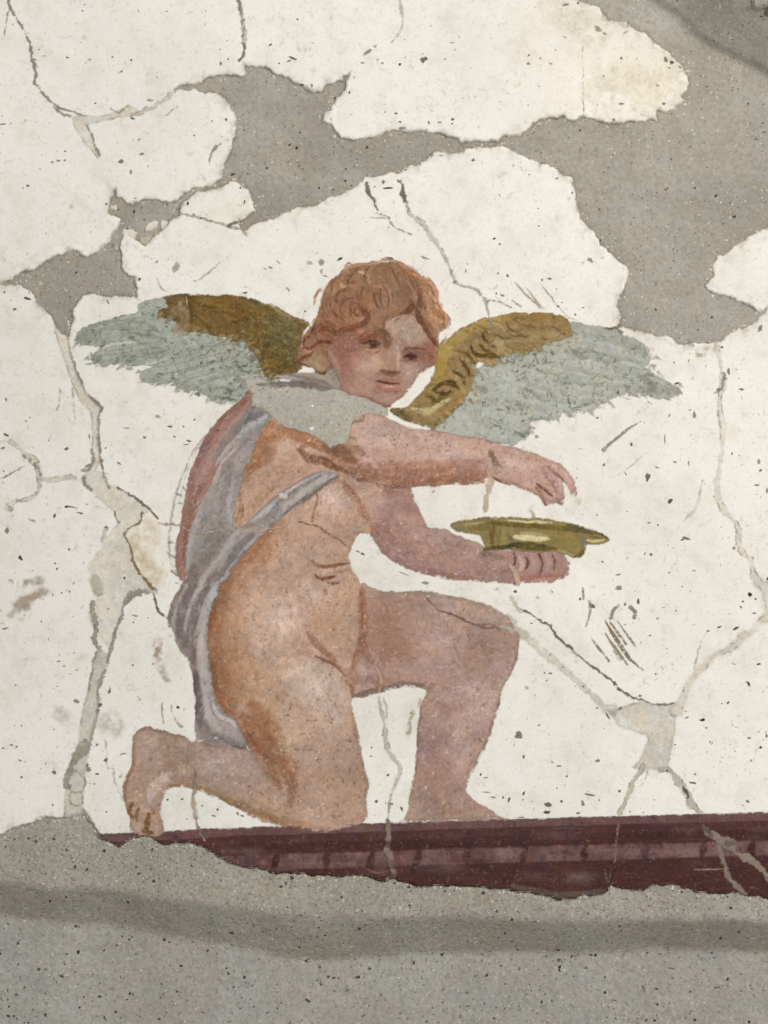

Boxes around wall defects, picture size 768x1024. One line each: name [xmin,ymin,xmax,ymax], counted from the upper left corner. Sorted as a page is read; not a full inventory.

crack [4,0,176,157]
crack [236,0,246,62]
flaking render [2,0,768,358]
crack [365,180,512,334]
flaking render [240,376,388,449]
crack [3,330,346,841]
crack [427,343,768,717]
crack [605,763,768,896]